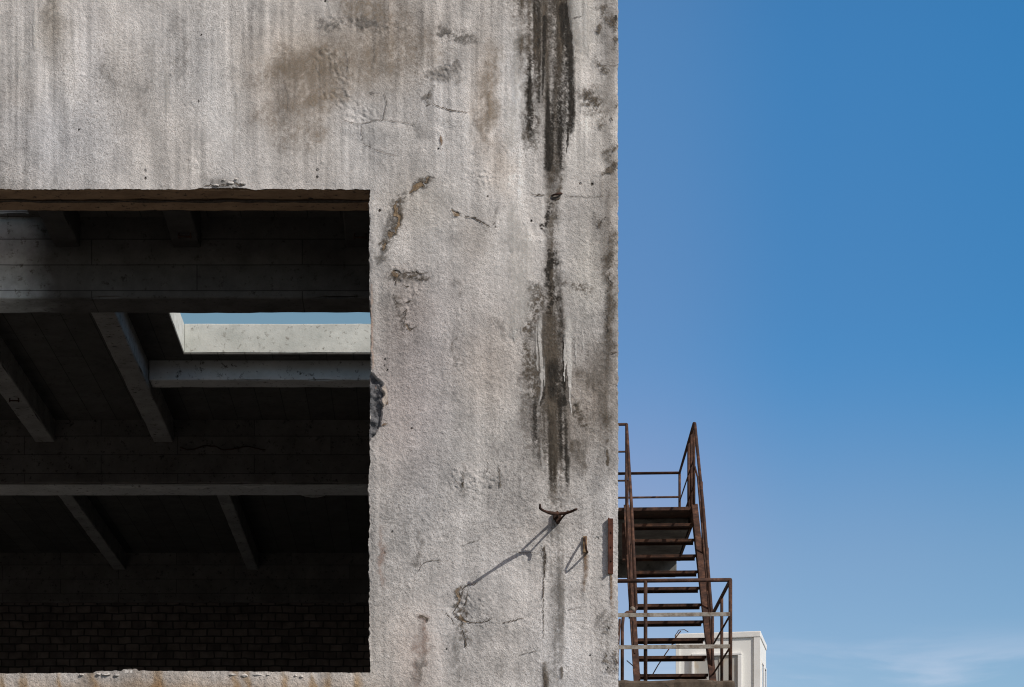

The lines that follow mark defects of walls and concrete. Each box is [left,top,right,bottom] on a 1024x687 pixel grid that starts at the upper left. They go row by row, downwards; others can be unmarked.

crack [345,92,468,156]
flaking render [383,201,401,250]
leakage [508,0,618,499]
spalling [369,289,387,439]